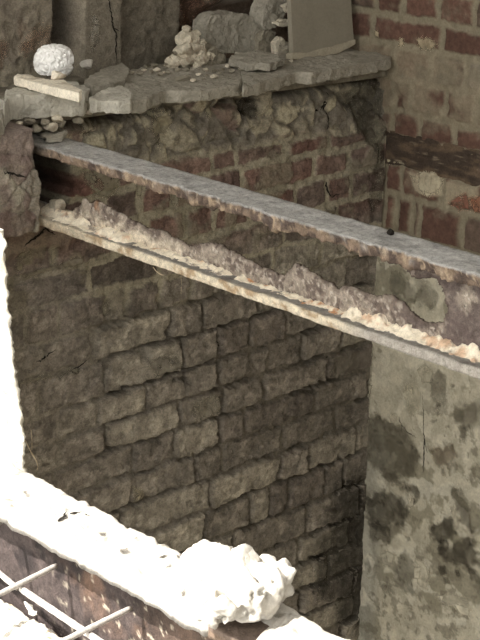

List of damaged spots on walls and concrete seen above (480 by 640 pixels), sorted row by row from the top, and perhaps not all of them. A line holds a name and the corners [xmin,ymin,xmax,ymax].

crack [108,0,119,64]
spalling [450,194,480,213]
damp [367,415,419,482]
crack [399,397,428,472]
damp [430,518,480,583]